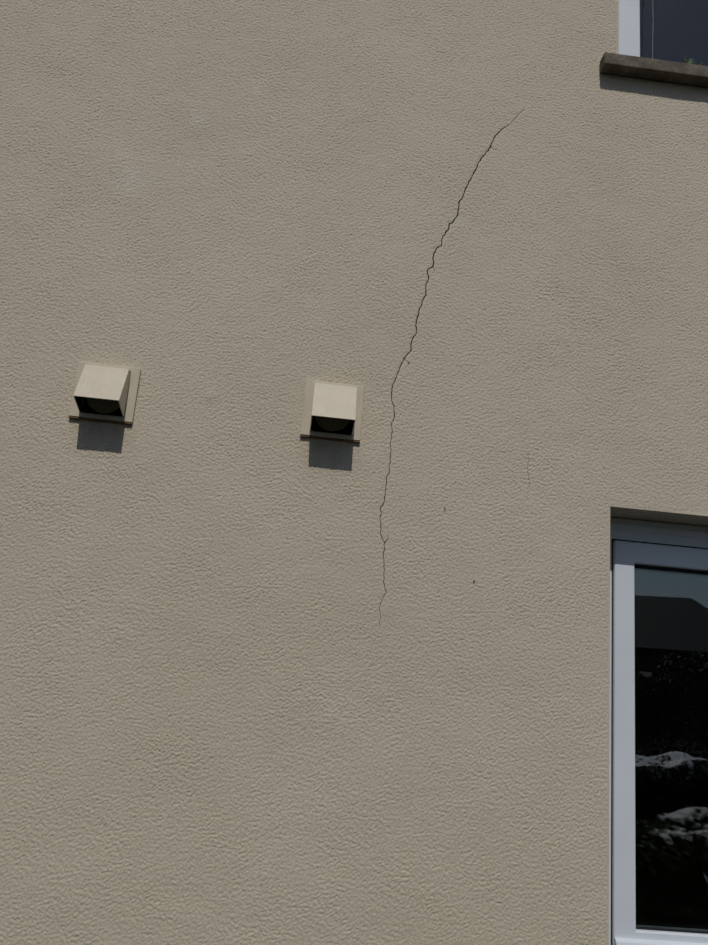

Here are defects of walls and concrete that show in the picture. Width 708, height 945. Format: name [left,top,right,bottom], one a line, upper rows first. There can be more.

crack [379,108,525,628]